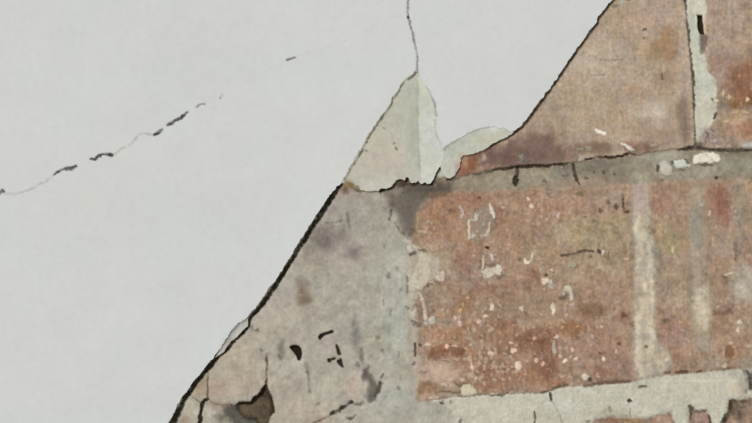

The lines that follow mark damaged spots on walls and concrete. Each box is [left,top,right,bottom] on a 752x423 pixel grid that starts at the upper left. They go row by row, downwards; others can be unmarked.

crack [54,153,113,175]
crack [153,103,205,135]
spalling [341,69,514,191]
peeling [595,129,634,151]
peeling [659,138,721,176]
crack [170,0,418,423]
peeling [459,203,506,240]
peeling [471,246,523,279]
peeling [406,212,478,396]
peeling [520,253,584,378]
peeling [507,341,522,380]
spalling [236,385,275,423]